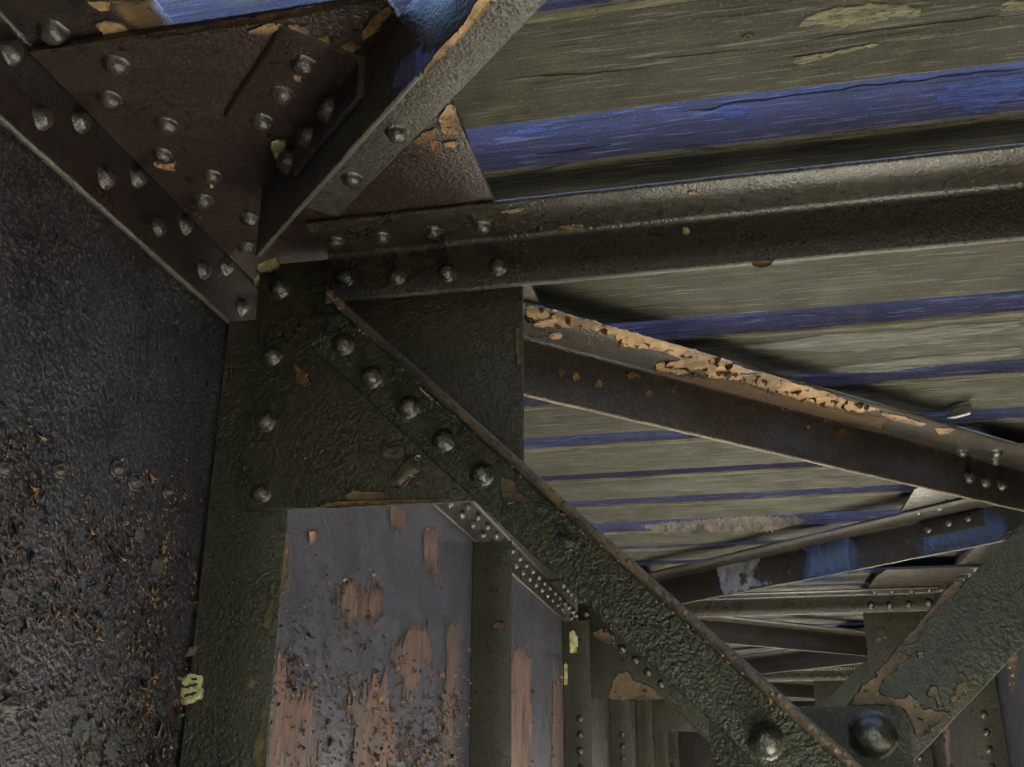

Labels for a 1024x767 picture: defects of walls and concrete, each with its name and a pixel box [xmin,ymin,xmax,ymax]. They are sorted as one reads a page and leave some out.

peeling [420,104,462,148]
peeling [525,305,956,435]
peeling [268,526,473,767]
peeling [607,670,661,701]
peeling [850,574,969,767]